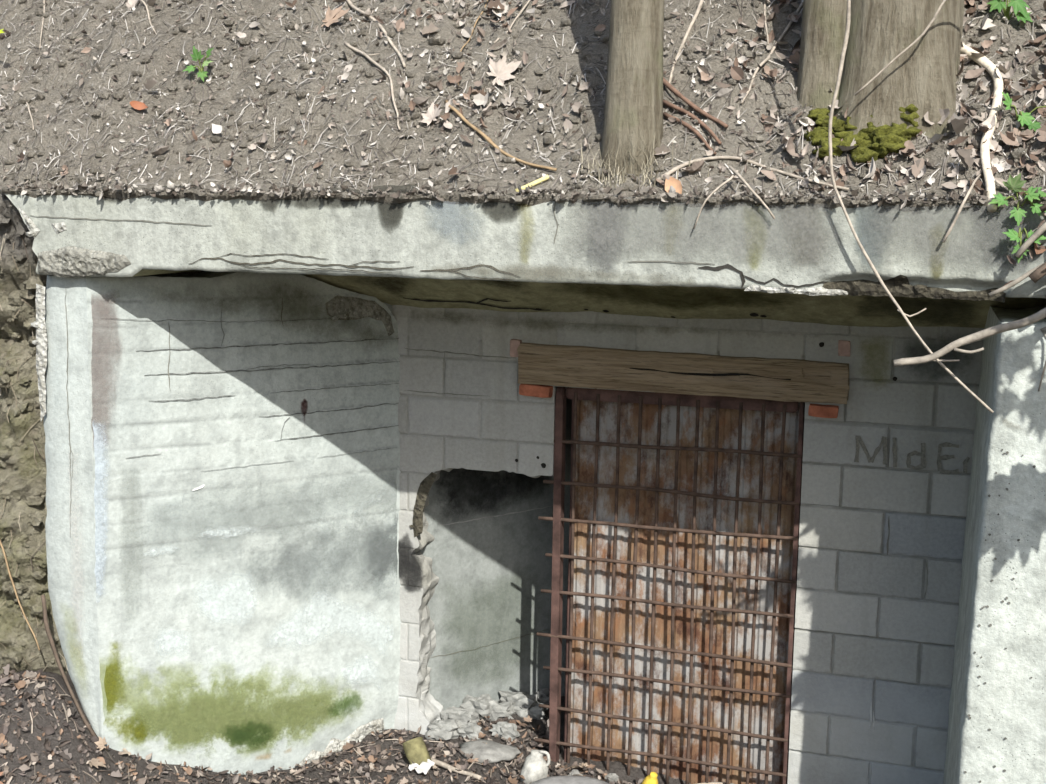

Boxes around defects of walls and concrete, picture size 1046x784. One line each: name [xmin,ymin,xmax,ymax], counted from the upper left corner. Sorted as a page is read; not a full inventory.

spalling [18,207,67,237]
crack [30,215,212,226]
water stain [380,185,402,222]
crack [190,253,519,280]
crack [631,261,828,289]
spalling [31,246,131,421]
spalling [325,295,394,336]
crack [102,298,514,471]
spalling [409,472,437,537]